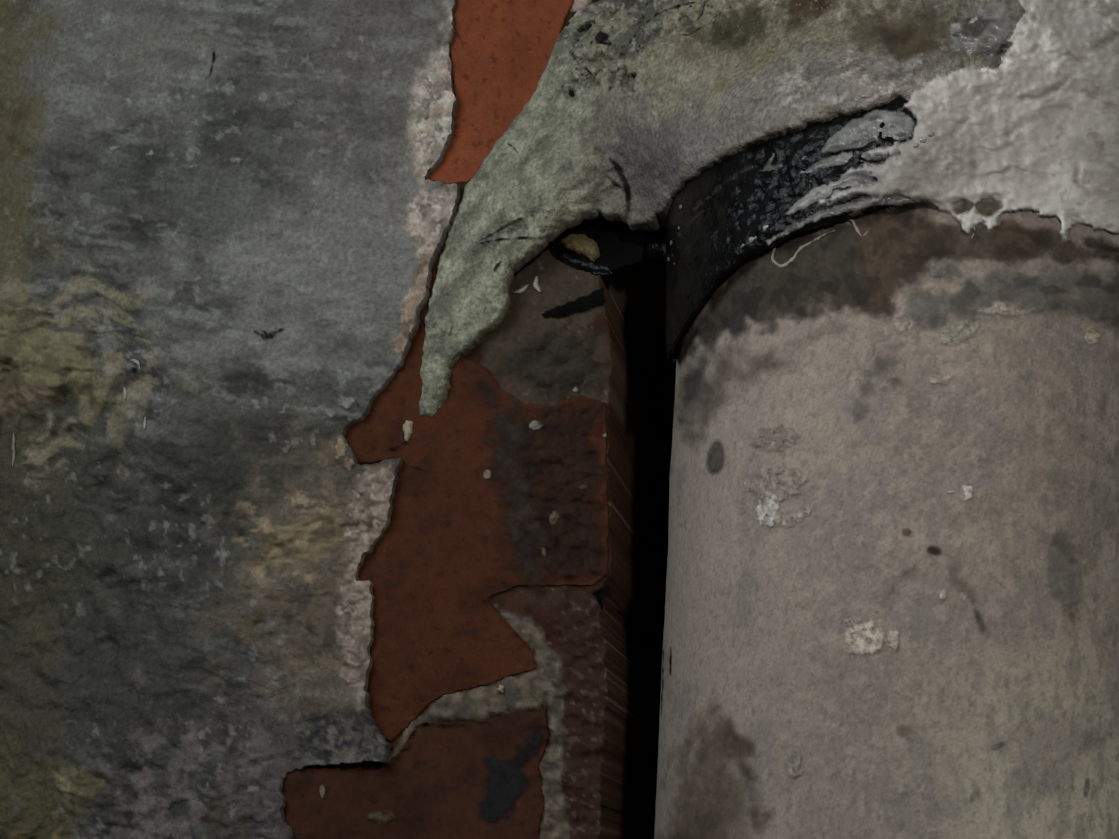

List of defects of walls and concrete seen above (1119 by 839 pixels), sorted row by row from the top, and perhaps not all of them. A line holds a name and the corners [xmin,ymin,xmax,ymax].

flaking render [254,0,609,839]
damp [681,0,1119,437]